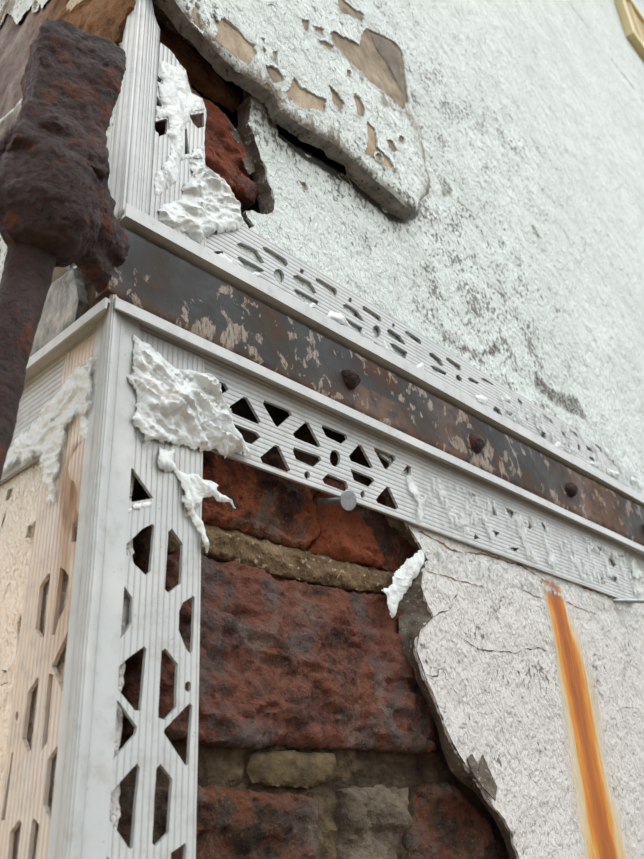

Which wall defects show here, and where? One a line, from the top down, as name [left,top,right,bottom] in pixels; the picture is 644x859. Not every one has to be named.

spalling [0,0,136,119]
spalling [152,0,415,229]
flaking render [381,488,518,859]
crack [427,571,484,617]
crack [419,531,546,600]
crack [458,635,546,660]
rust [544,581,626,859]
crack [567,587,611,615]